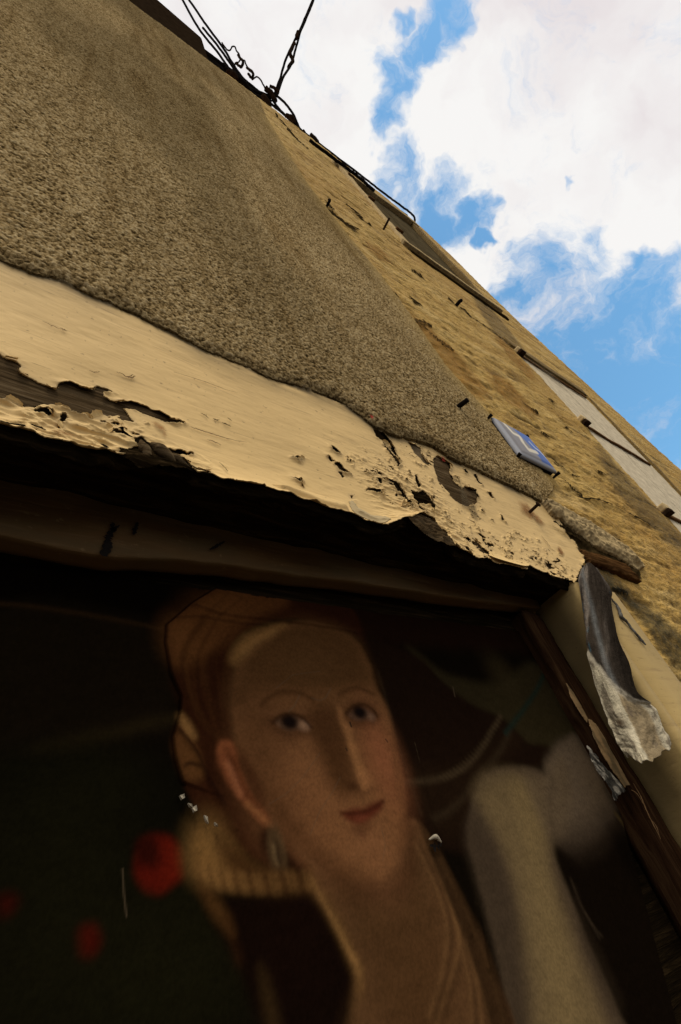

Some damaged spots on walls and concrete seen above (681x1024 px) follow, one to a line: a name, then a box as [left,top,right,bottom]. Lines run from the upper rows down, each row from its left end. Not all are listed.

peeling [0,355,214,476]
peeling [349,496,391,523]
peeling [366,430,560,569]